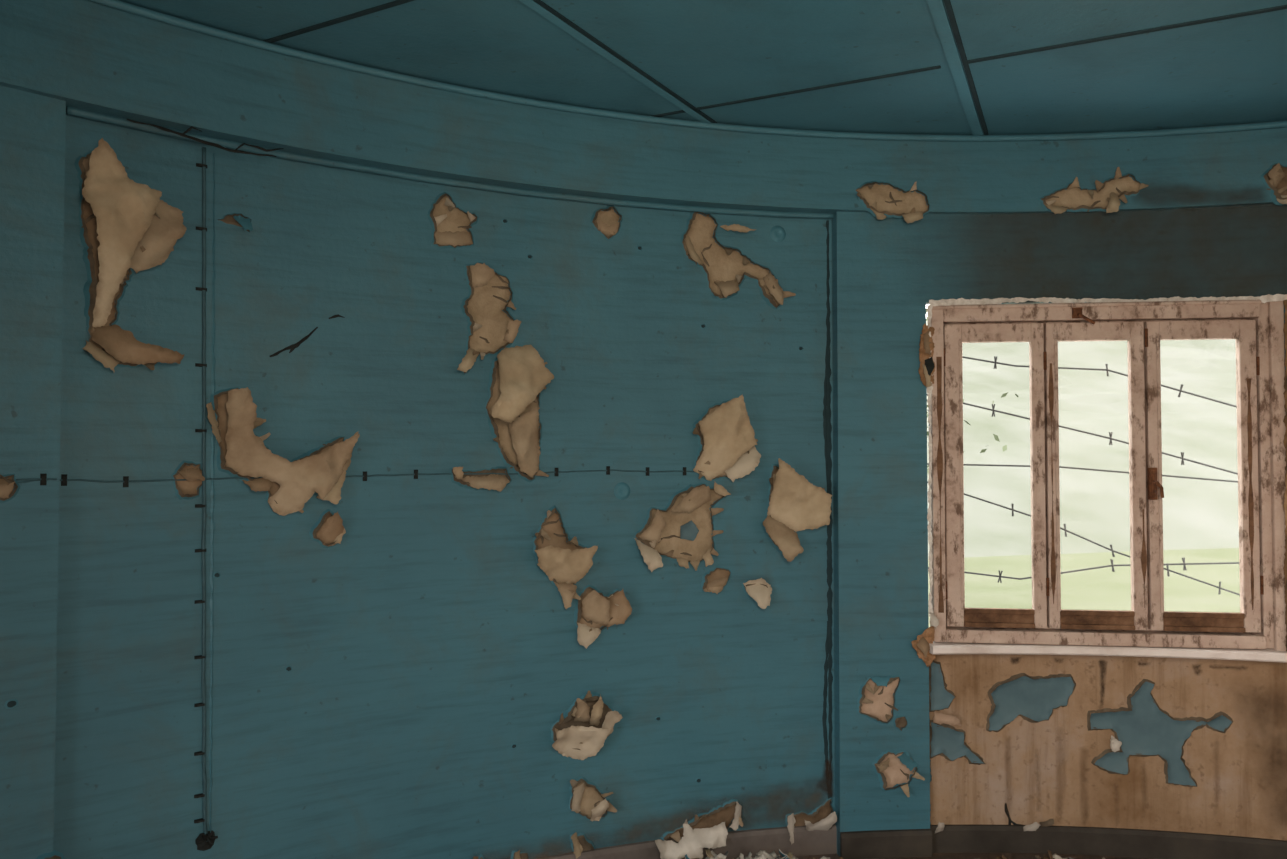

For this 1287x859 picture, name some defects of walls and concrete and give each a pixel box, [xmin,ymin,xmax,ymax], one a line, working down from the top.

peeling [74,138,187,372]
peeling [680,212,796,310]
peeling [854,181,930,224]
peeling [1038,167,1148,214]
peeling [450,262,554,492]
peeling [171,387,360,548]
peeling [532,505,632,649]
peeling [634,394,832,609]
peeling [872,294,1287,841]
peeling [550,690,623,760]
peeling [857,675,907,731]
peeling [569,776,617,859]